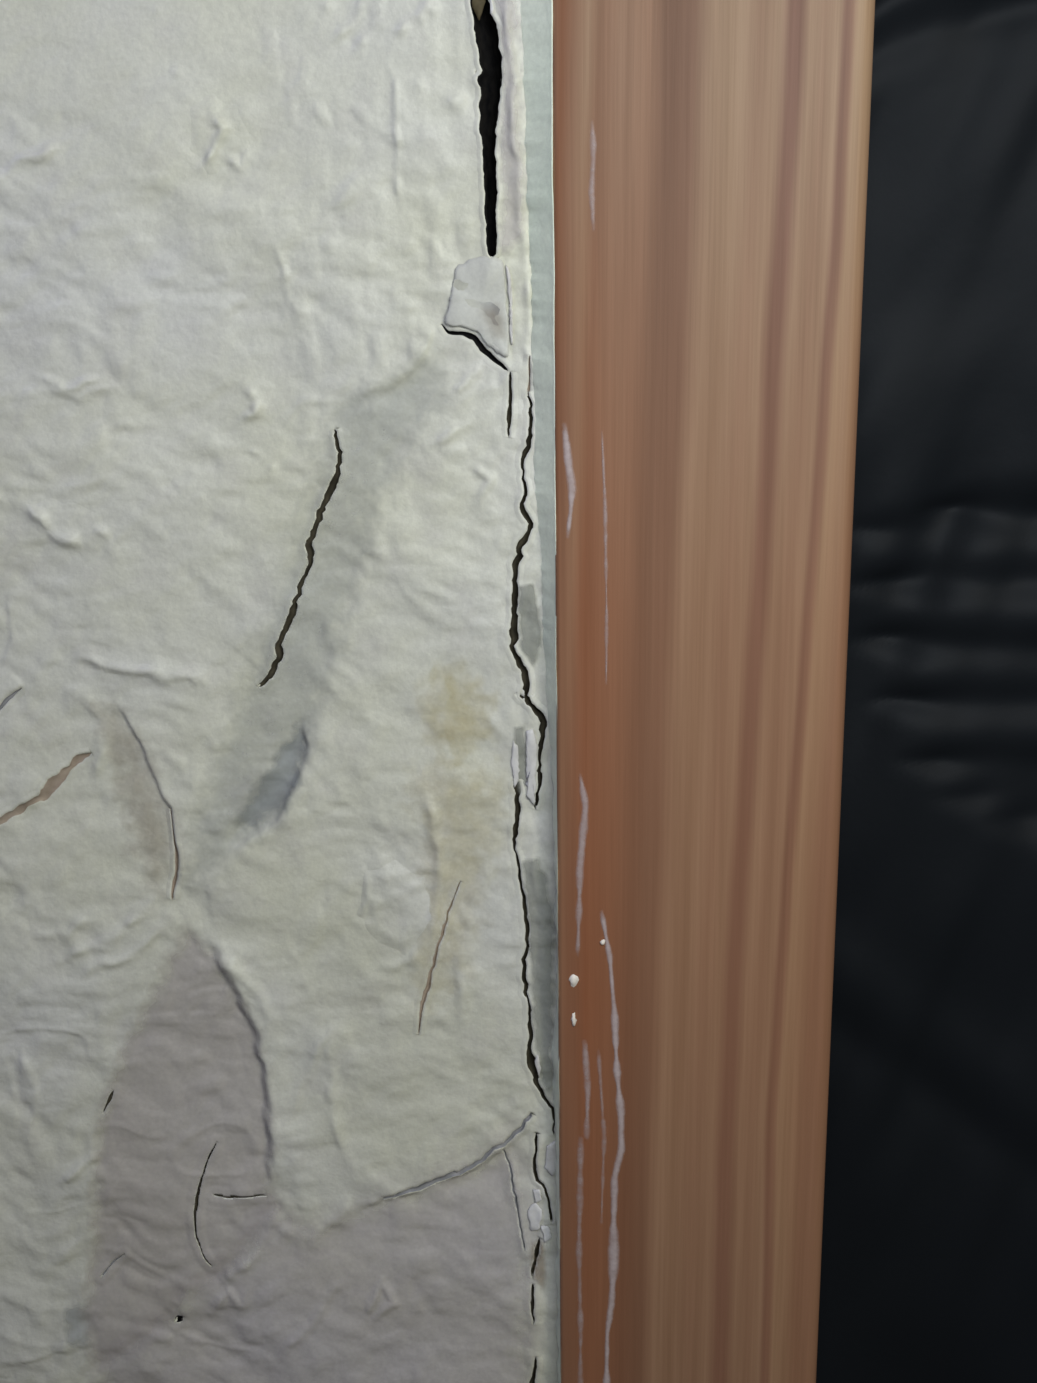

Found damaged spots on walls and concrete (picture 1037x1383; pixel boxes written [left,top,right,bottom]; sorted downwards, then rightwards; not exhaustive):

crack [465,0,515,258]
peeling [437,256,513,375]
crack [254,428,349,691]
crack [0,747,94,831]
spalling [242,732,304,825]
crack [381,355,557,1383]
spalling [86,939,273,1362]